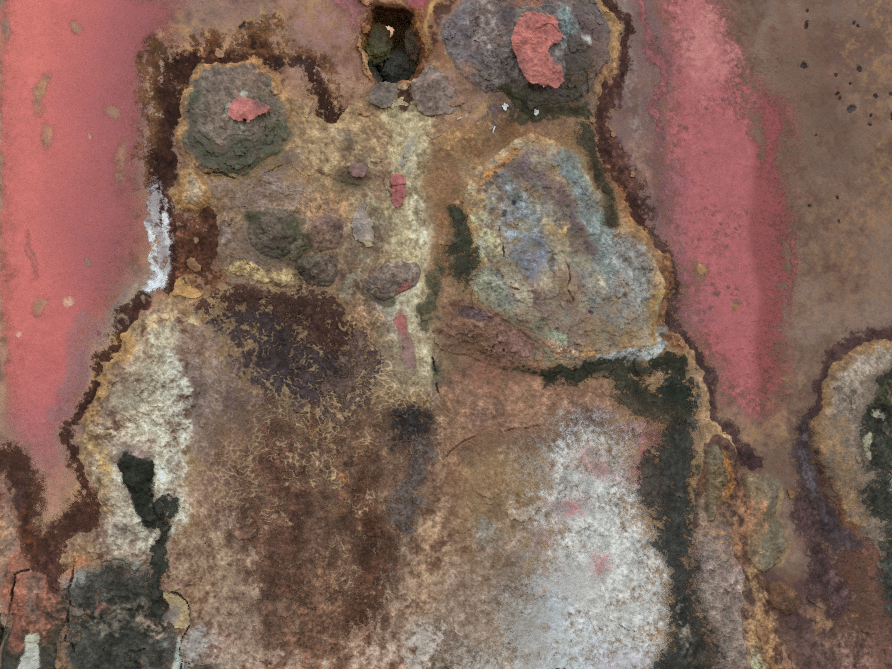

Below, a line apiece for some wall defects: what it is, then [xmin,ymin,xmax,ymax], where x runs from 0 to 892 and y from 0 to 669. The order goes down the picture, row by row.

peeling [228,97,272,123]
hole [355,0,459,117]
efflorescence [141,180,174,295]
peeling [186,257,201,272]
peeling [389,173,406,210]
leakage [145,493,180,623]
spalling [372,397,439,541]
leakage [402,357,698,669]
leakage [862,432,873,460]
corrosion [548,592,629,669]